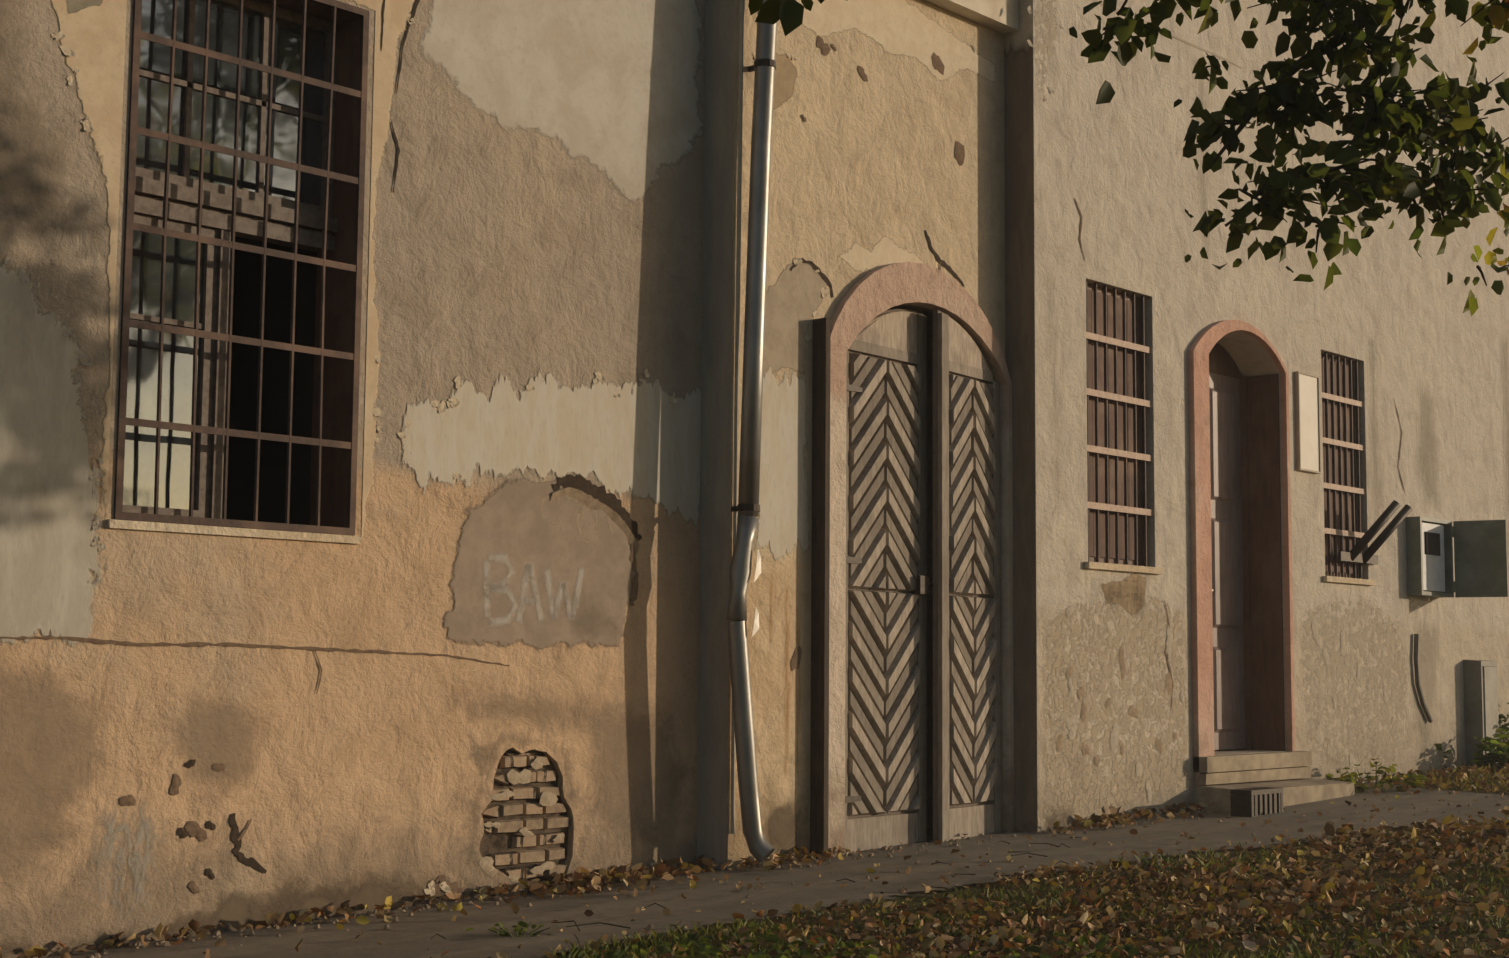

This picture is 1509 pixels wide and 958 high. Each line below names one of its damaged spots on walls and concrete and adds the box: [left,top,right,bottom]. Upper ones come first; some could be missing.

peeling [796,0,996,82]
peeling [773,53,797,110]
flaking render [955,141,965,166]
peeling [345,0,704,540]
peeling [838,236,924,272]
crack [925,230,964,286]
peeling [0,0,127,646]
crack [0,635,509,694]
flaking render [120,794,136,806]
flaking render [177,821,216,842]
flaking render [169,759,226,796]
flaking render [473,749,569,888]